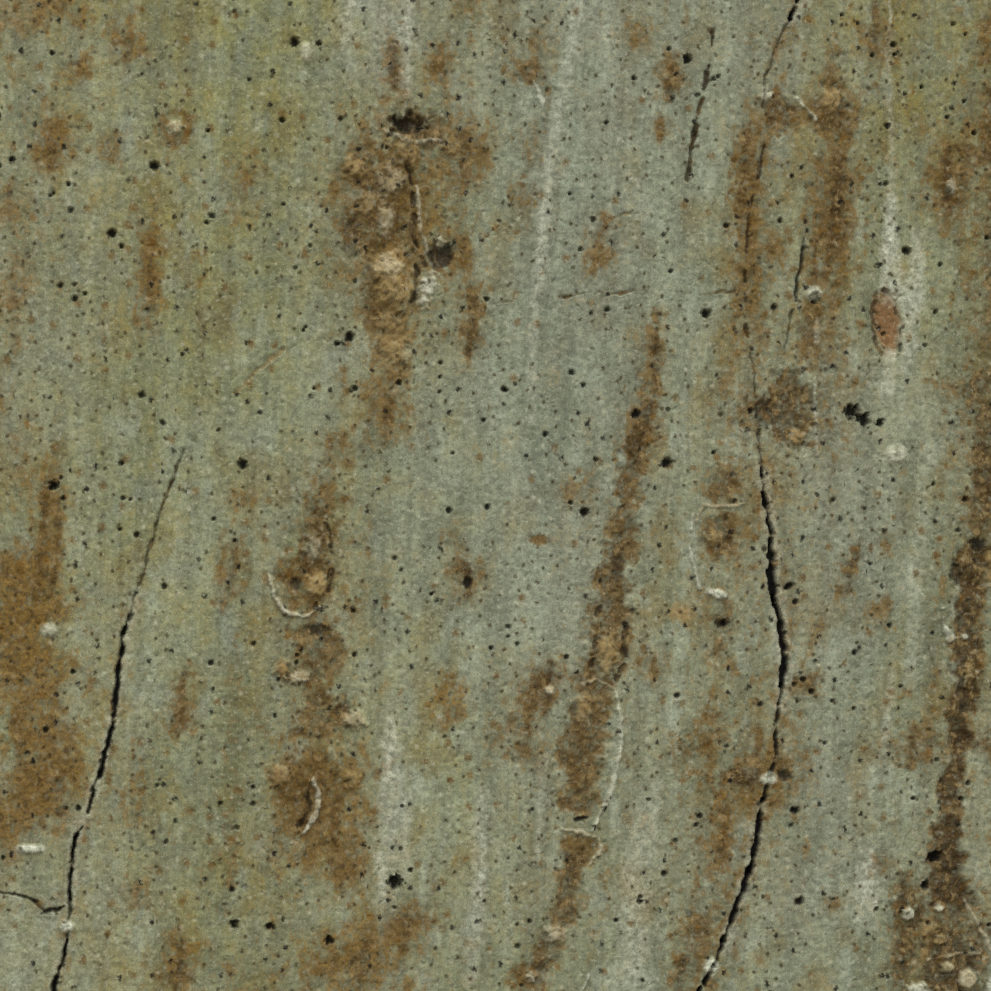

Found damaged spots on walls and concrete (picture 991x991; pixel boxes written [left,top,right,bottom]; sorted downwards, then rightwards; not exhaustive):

rust [0,0,214,922]
peeling [319,79,468,399]
rust [376,0,569,398]
rust [608,269,678,464]
crack [683,27,717,190]
crack [696,143,790,991]
crack [760,0,802,111]
crack [782,237,806,357]
rust [720,69,871,367]
spalling [867,278,906,362]
crack [0,447,186,991]
rust [244,728,452,991]